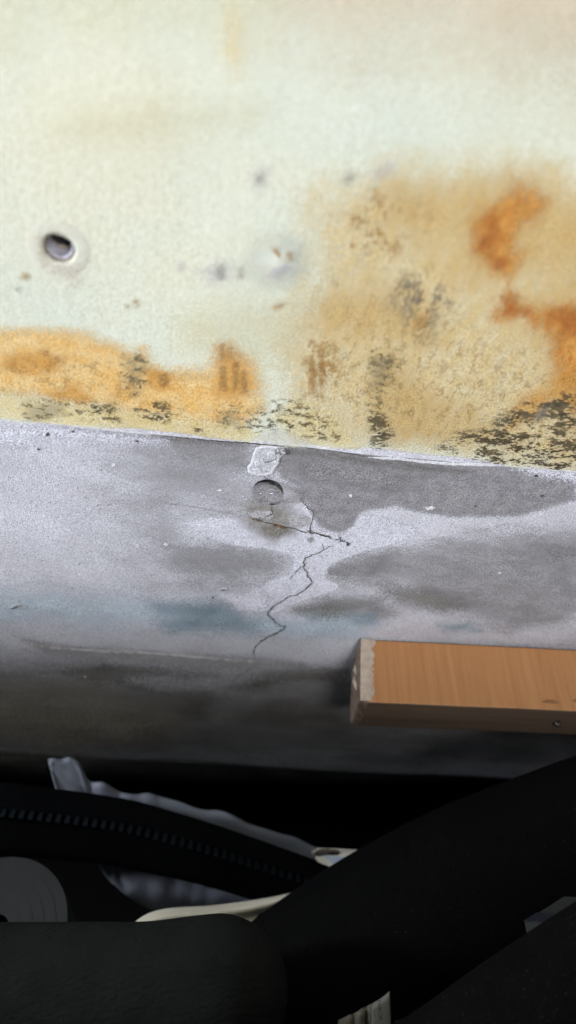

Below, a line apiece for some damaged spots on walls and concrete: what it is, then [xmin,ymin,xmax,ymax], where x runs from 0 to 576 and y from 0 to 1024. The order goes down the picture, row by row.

corrosion [215,345,249,397]
water stain [0,155,576,636]
corrosion [304,341,343,398]
corrosion [469,180,576,418]
crack [166,499,350,657]